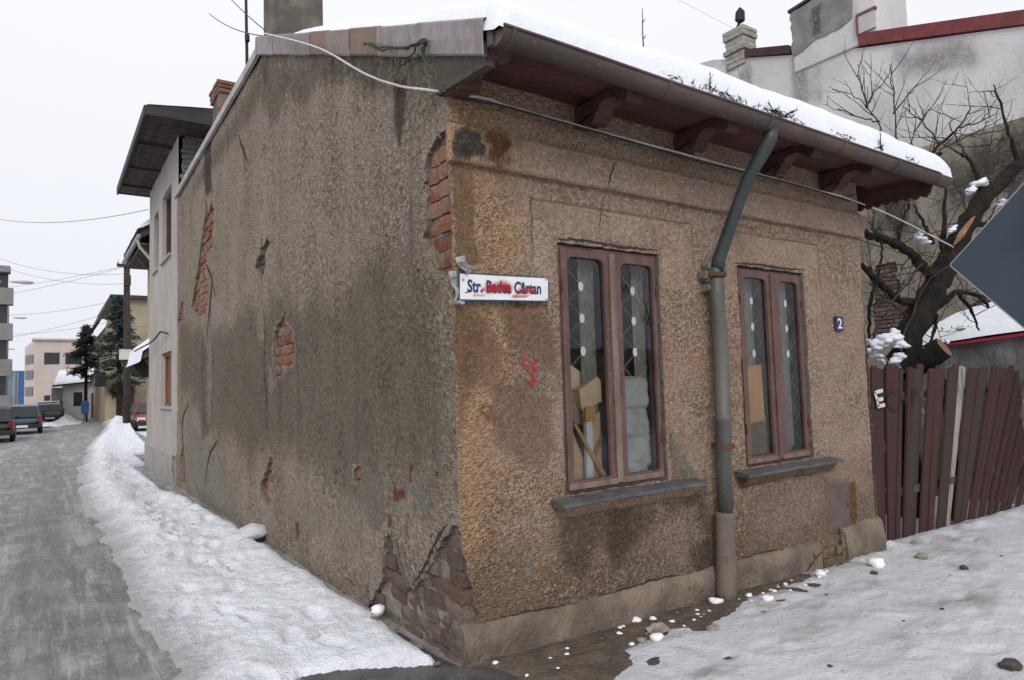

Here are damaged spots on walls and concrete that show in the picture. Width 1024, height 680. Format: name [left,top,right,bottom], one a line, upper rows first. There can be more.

flaking render [423,129,479,275]
crack [554,163,660,251]
flaking render [178,200,214,327]
flaking render [255,238,270,280]
flaking render [273,315,295,382]
crack [172,403,218,481]
flaking render [260,456,274,505]
flaking render [369,525,479,663]